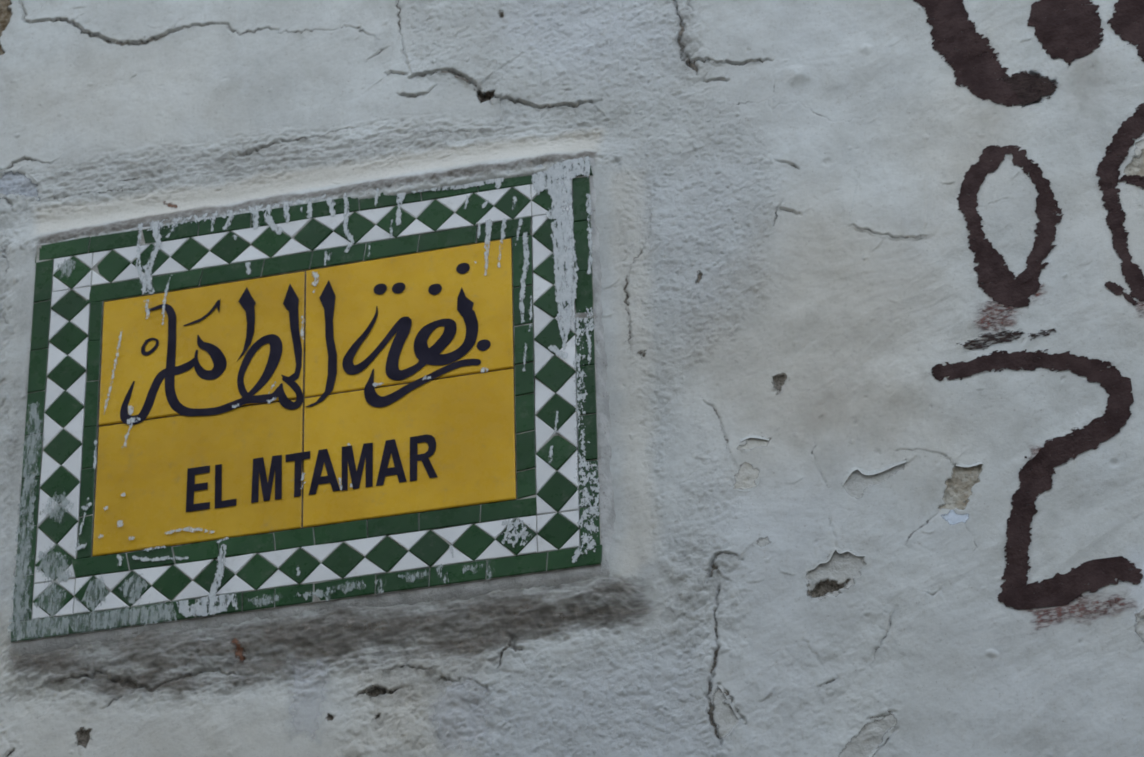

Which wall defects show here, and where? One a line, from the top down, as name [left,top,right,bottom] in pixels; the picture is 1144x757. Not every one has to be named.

spalling [0,0,12,55]
crack [51,20,166,46]
crack [676,7,763,82]
crack [377,52,580,109]
peeling [1124,137,1144,176]
peeling [939,462,983,525]
spalling [806,547,866,600]
crack [708,554,738,738]